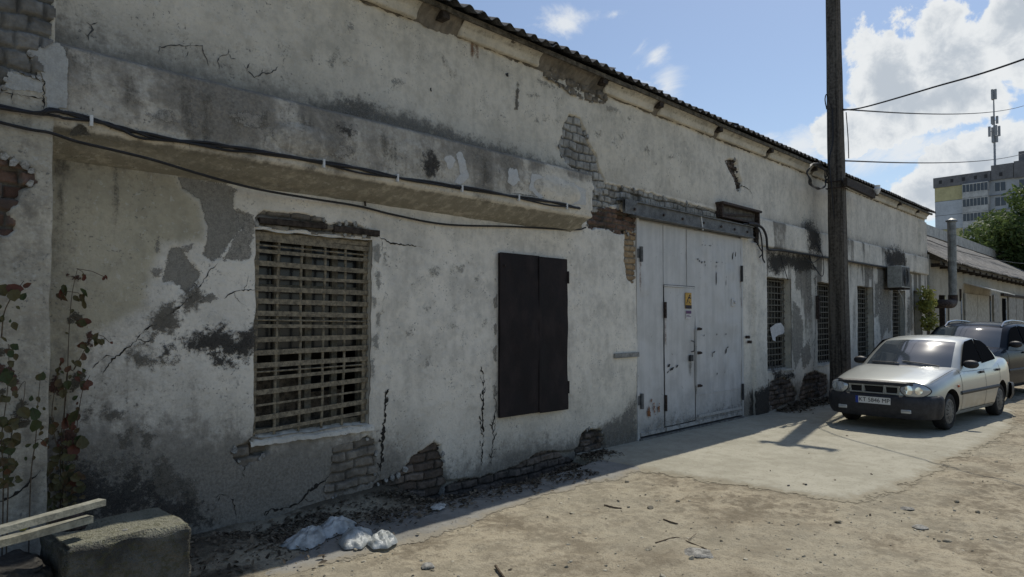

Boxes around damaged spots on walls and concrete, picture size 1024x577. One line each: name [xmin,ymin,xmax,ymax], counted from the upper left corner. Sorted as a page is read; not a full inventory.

spalling [0,0,68,108]
crack [158,44,277,78]
spalling [0,152,38,236]
leakage [314,99,541,162]
leakage [423,150,440,177]
spalling [558,116,755,283]
flaking render [152,177,386,348]
leakage [767,220,822,276]
crack [92,263,218,371]
leakage [125,282,261,371]
crack [377,389,389,476]
spalling [324,426,604,500]